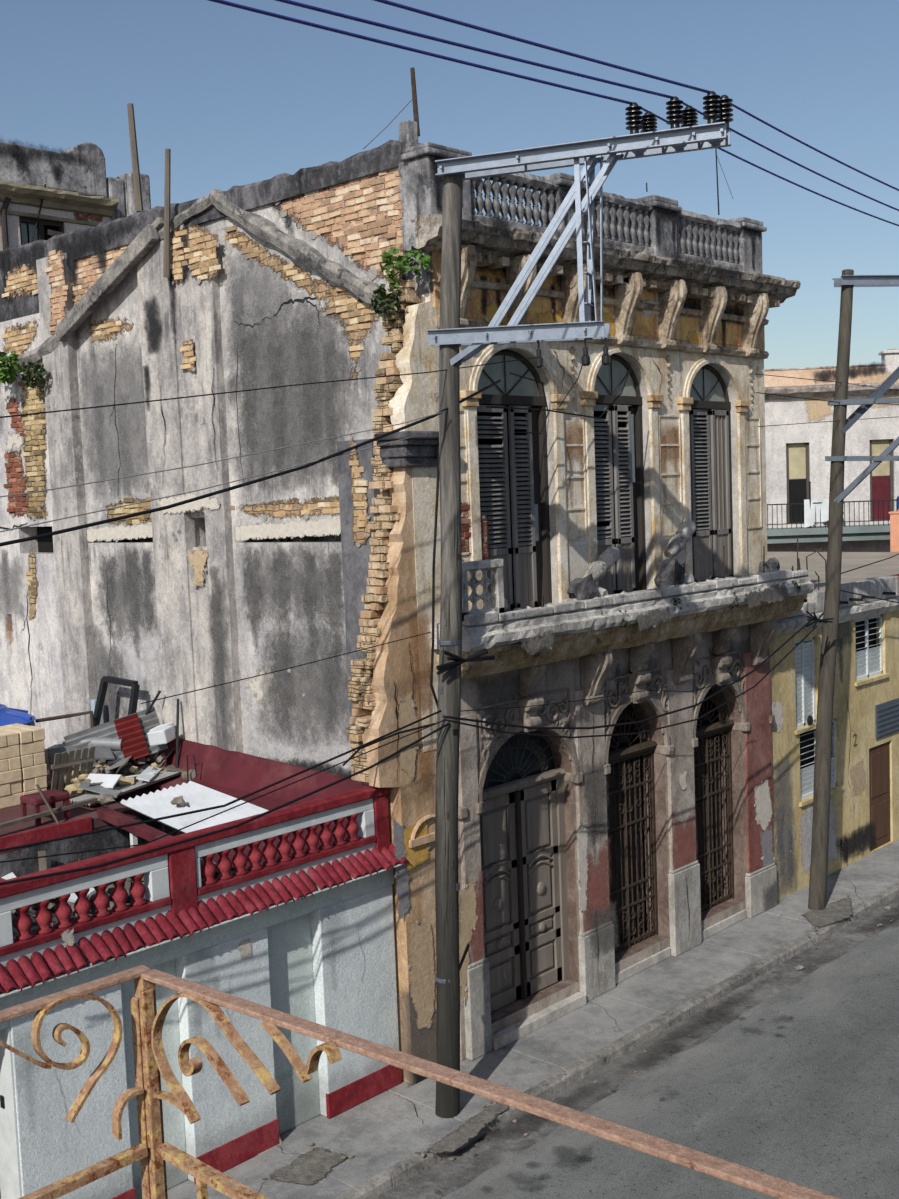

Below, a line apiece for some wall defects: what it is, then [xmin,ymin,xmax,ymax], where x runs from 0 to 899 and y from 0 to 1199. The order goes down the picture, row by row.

flaking render [4,378,48,520]
spalling [87,166,438,786]
crack [200,292,329,483]
water stain [94,552,160,723]
water stain [209,511,348,763]
flaking render [393,818,435,1029]
peeling [577,826,588,912]
water stain [764,760,813,910]
water stain [828,799,876,863]